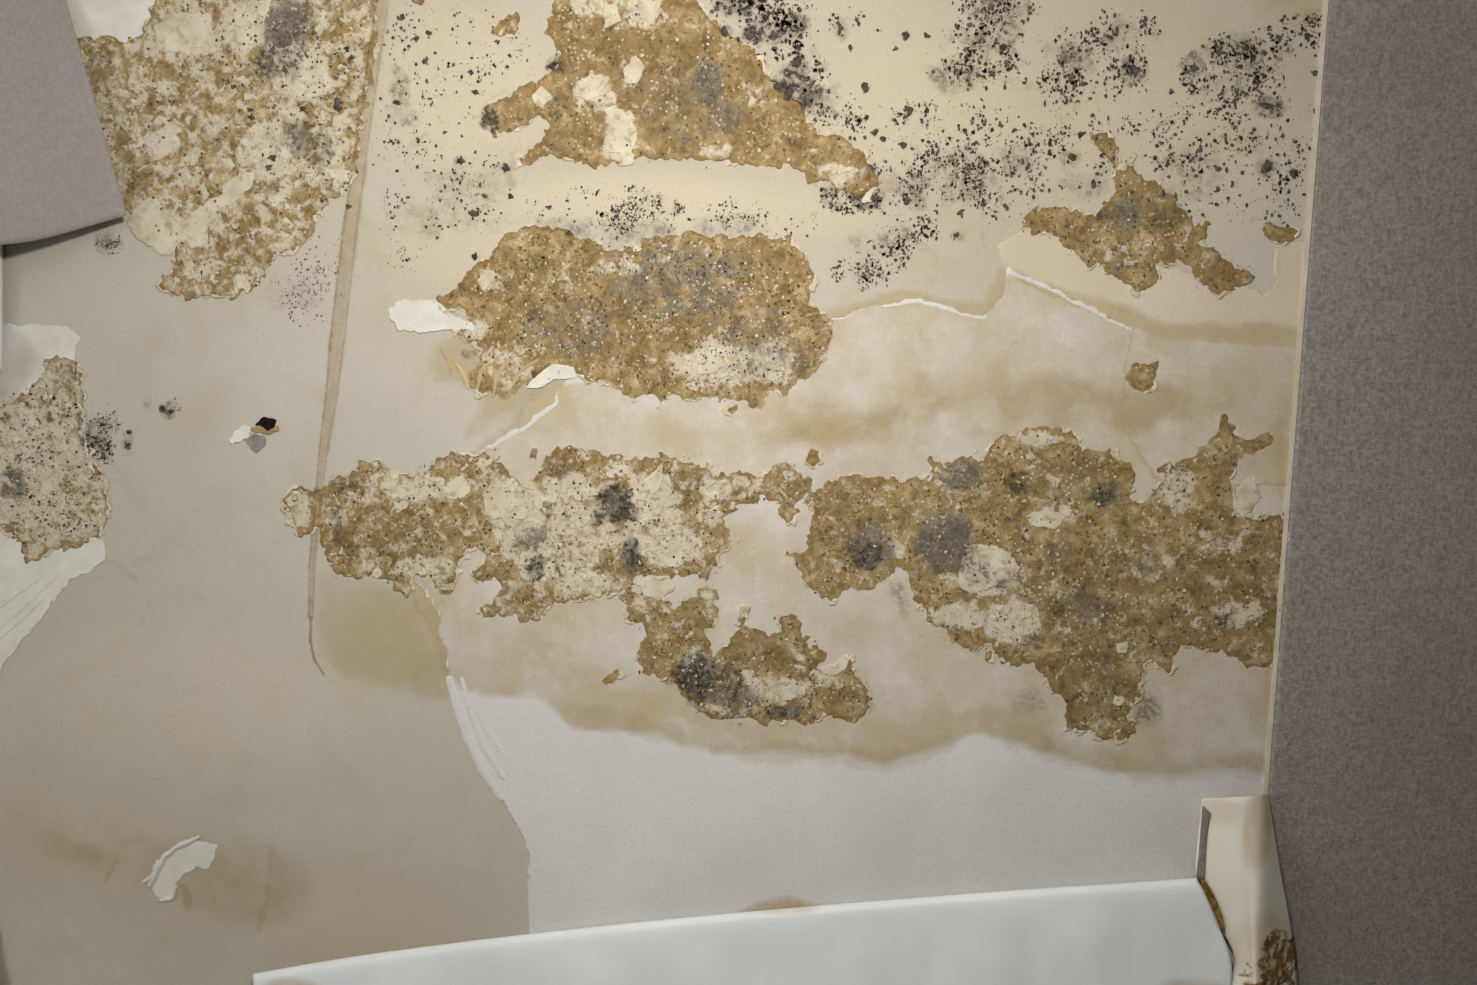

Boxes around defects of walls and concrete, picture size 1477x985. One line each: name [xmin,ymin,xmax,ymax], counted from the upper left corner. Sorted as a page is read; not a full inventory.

spalling [77,0,382,301]
spalling [480,0,881,203]
water stain [218,0,1322,306]
spalling [1020,129,1255,300]
spalling [0,355,113,564]
water stain [523,386,575,423]
spalling [433,222,833,417]
spalling [280,413,1291,745]
water stain [568,679,710,729]
peeling [142,835,218,902]